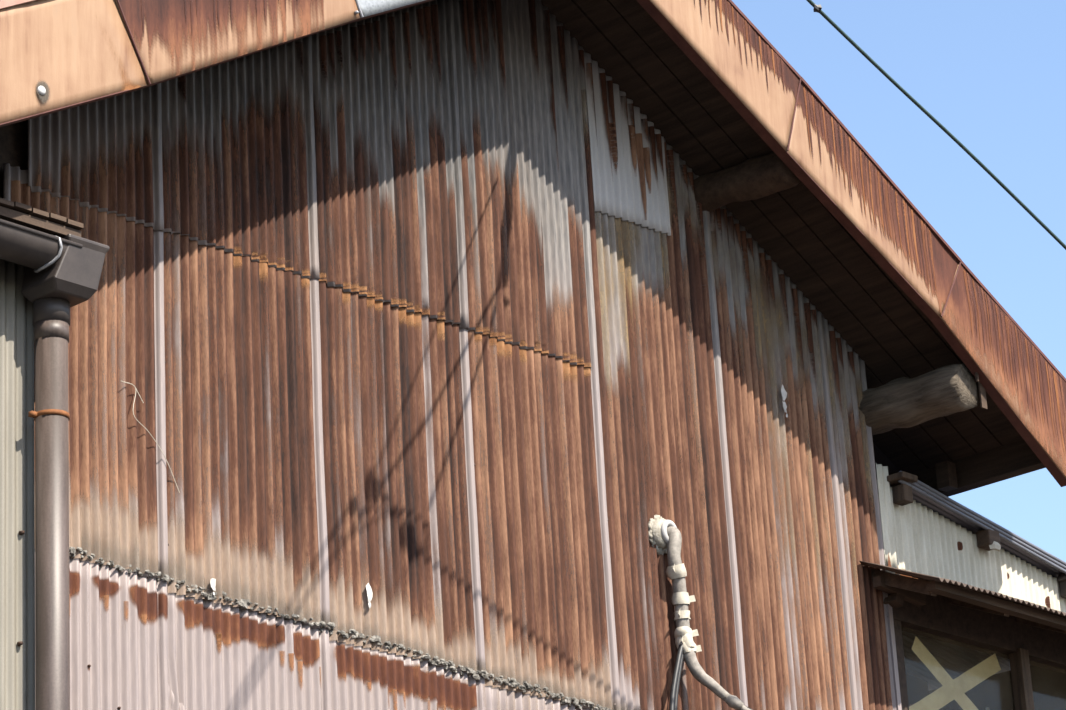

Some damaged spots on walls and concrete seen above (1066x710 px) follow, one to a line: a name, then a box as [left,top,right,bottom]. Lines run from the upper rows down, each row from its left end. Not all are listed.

rust [119,0,441,101]
rust [461,0,506,86]
rust [528,0,568,154]
rust [694,0,1066,476]
rust [11,50,918,710]